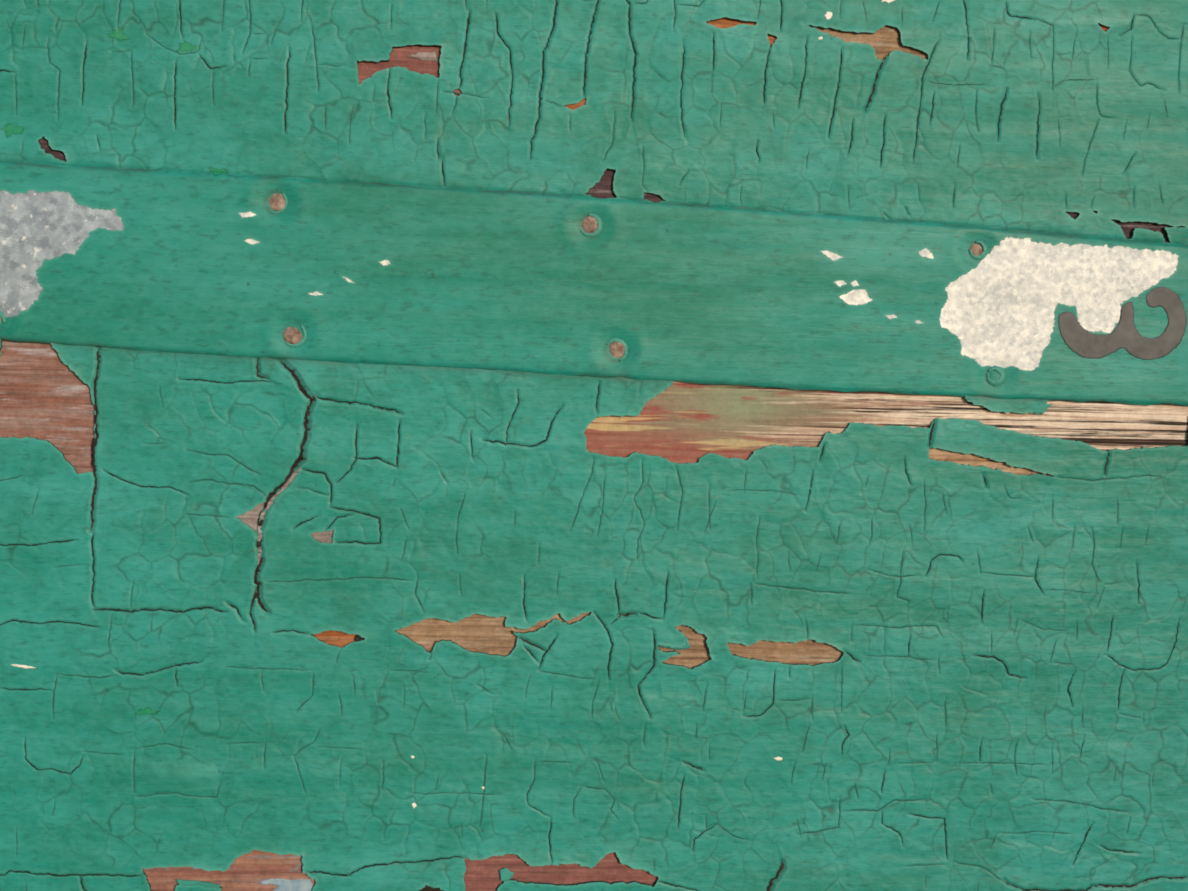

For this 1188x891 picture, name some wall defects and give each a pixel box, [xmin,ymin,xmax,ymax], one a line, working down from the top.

crack [424,0,705,186]
crack [806,48,886,168]
crack [884,0,1184,218]
peeling [0,190,123,317]
peeling [940,219,1186,371]
peeling [0,339,95,474]
peeling [584,381,1188,464]
crack [0,348,432,719]
crack [743,450,1187,891]
peeling [142,850,316,891]
crack [309,735,617,876]
peeling [464,852,659,891]